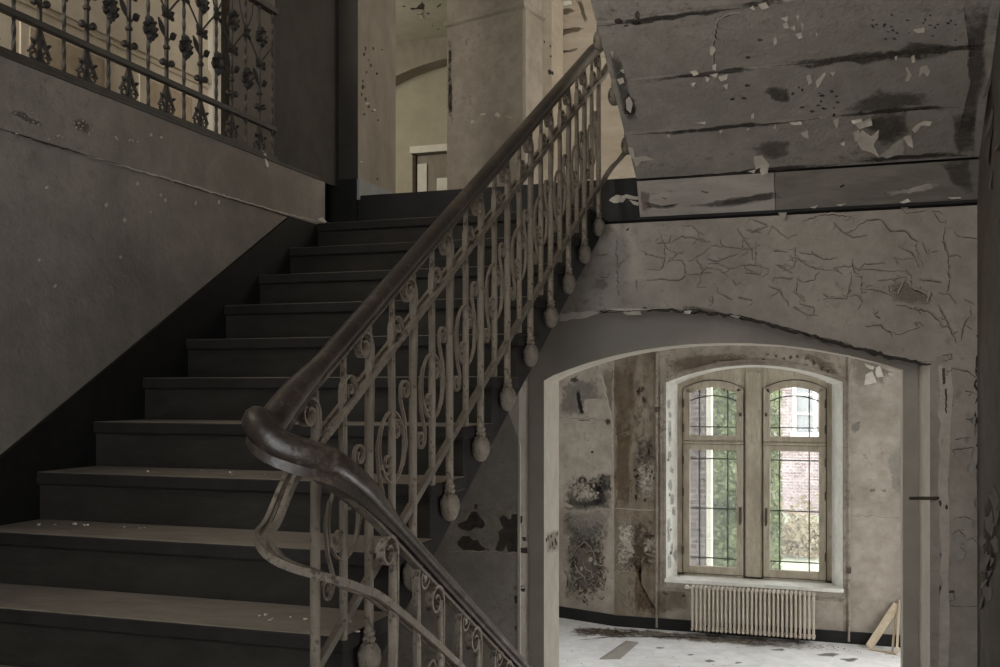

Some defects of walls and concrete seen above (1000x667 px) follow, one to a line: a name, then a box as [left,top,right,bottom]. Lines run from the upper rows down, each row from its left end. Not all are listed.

peeling [610,51,636,115]
peeling [665,64,747,90]
leakage [871,13,988,151]
crack [10,132,319,222]
peeling [609,194,675,208]
peeling [691,191,773,207]
peeling [748,155,769,175]
peeling [841,115,932,158]
crack [596,207,977,458]
leakage [564,428,655,508]
peeling [558,307,955,667]
peeling [457,504,527,553]